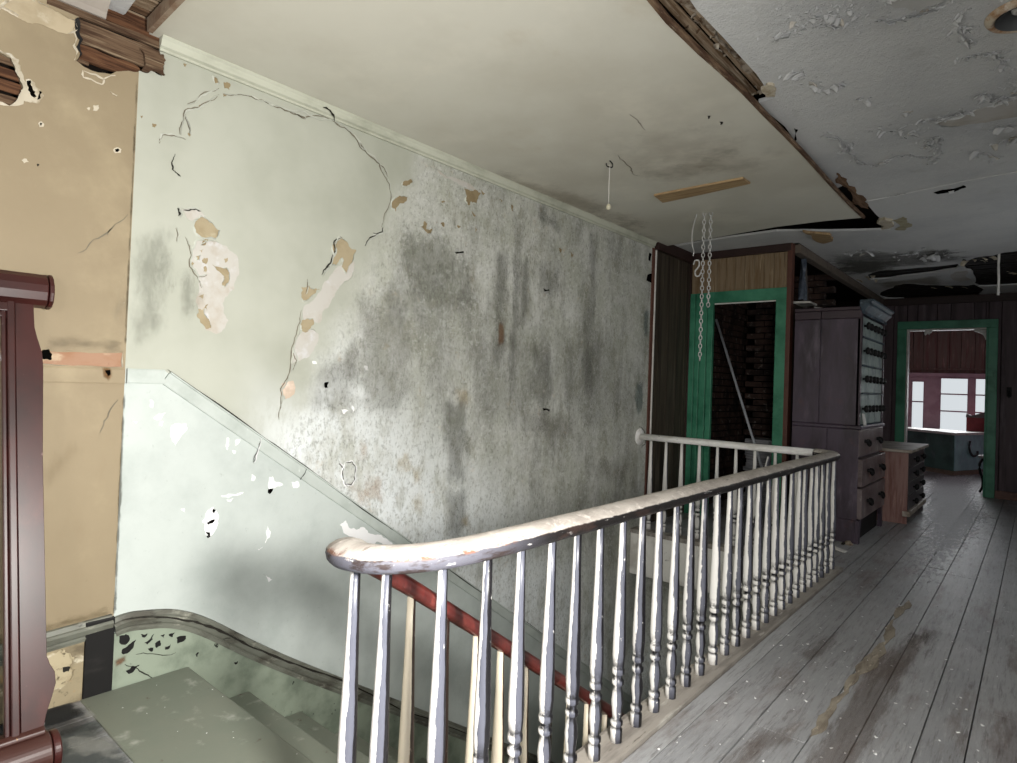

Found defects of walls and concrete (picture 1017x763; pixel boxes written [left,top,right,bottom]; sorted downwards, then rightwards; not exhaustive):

spalling [0,50,44,106]
spalling [0,0,166,96]
crack [158,88,392,246]
crack [79,214,128,253]
crack [176,207,207,288]
flaking render [182,209,239,334]
crack [278,238,342,418]
flaking render [291,236,356,364]
peeling [202,507,219,538]
peeling [340,521,392,545]
peeling [47,649,76,690]
peeling [119,633,186,654]